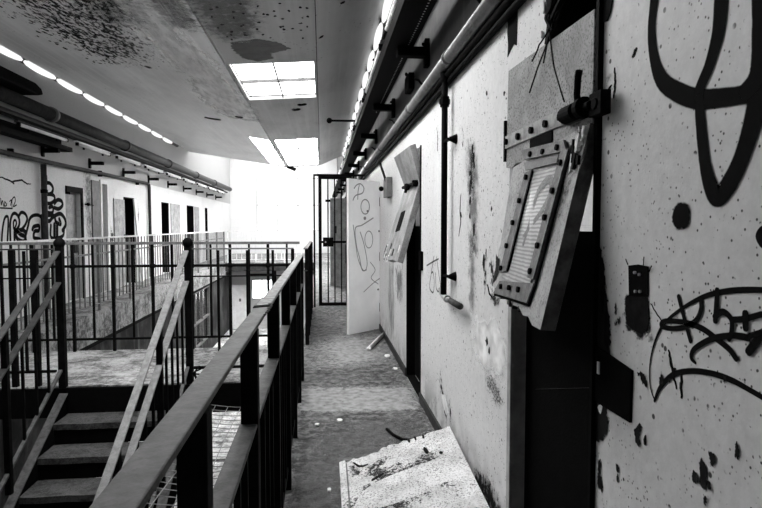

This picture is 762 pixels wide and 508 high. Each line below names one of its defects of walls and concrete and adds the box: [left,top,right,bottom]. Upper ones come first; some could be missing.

damp [0,0,256,120]
damp [231,39,291,62]
damp [468,144,477,305]